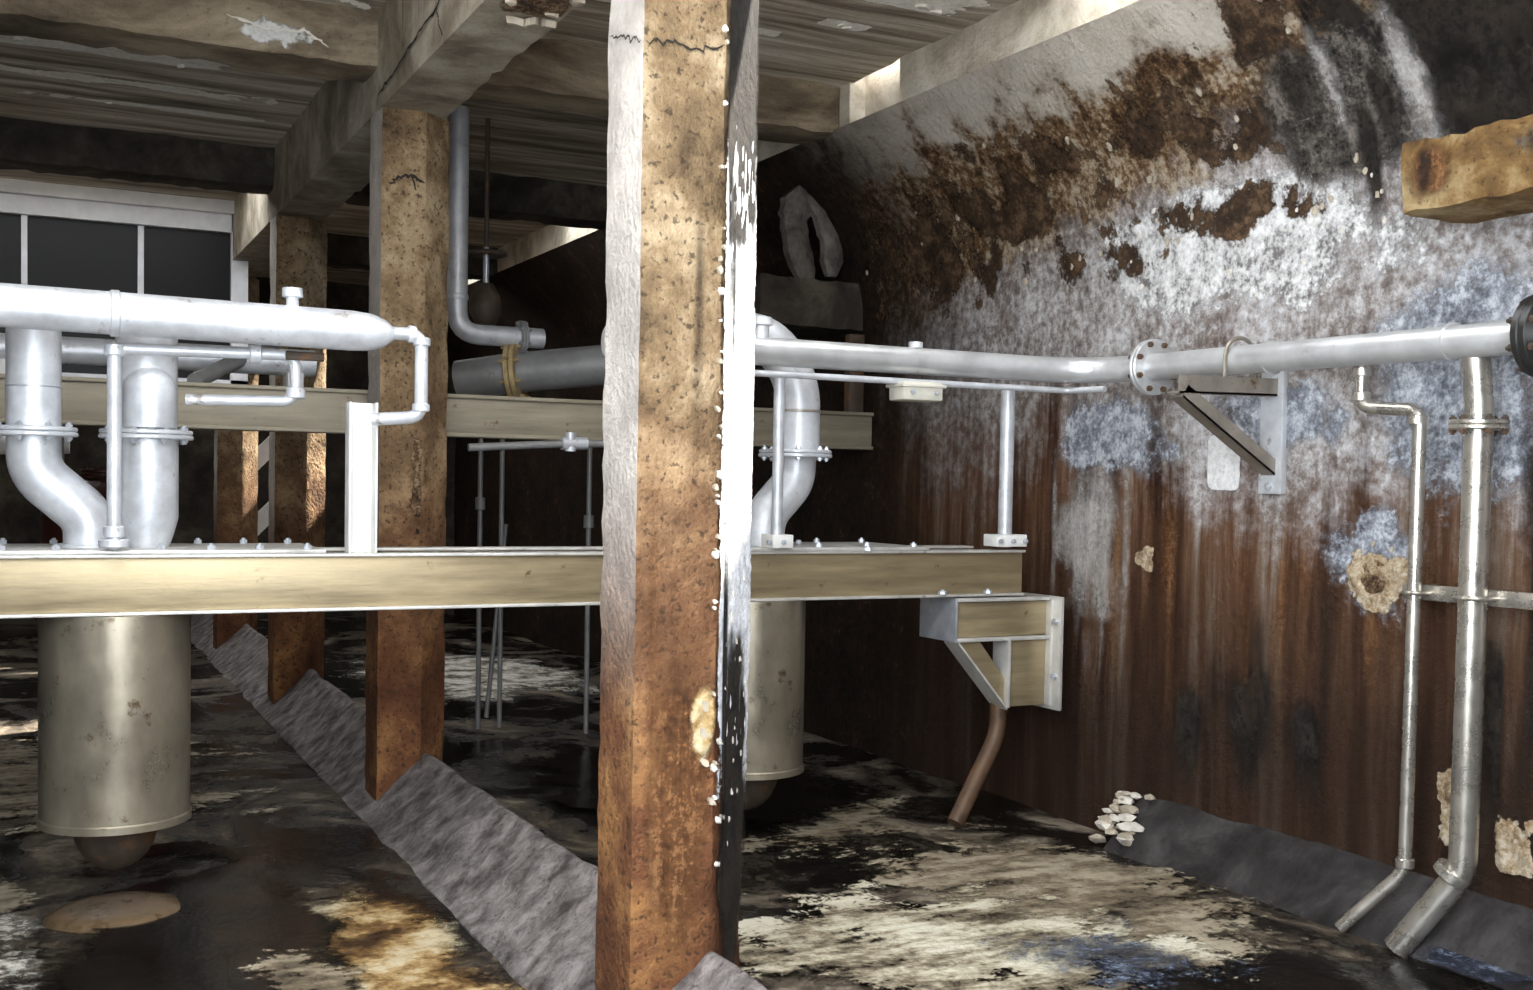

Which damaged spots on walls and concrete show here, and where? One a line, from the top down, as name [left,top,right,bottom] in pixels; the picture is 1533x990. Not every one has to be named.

peeling [337,0,371,11]
spalling [500,0,611,29]
crack [610,34,725,53]
peeling [817,18,872,31]
leakage [1192,0,1533,208]
peeling [1056,398,1180,613]
rust [1112,521,1121,594]
rust [1165,511,1174,592]
spalling [1328,506,1409,615]
spalling [691,689,715,767]
spalling [1436,766,1452,846]
spalling [1494,815,1533,878]